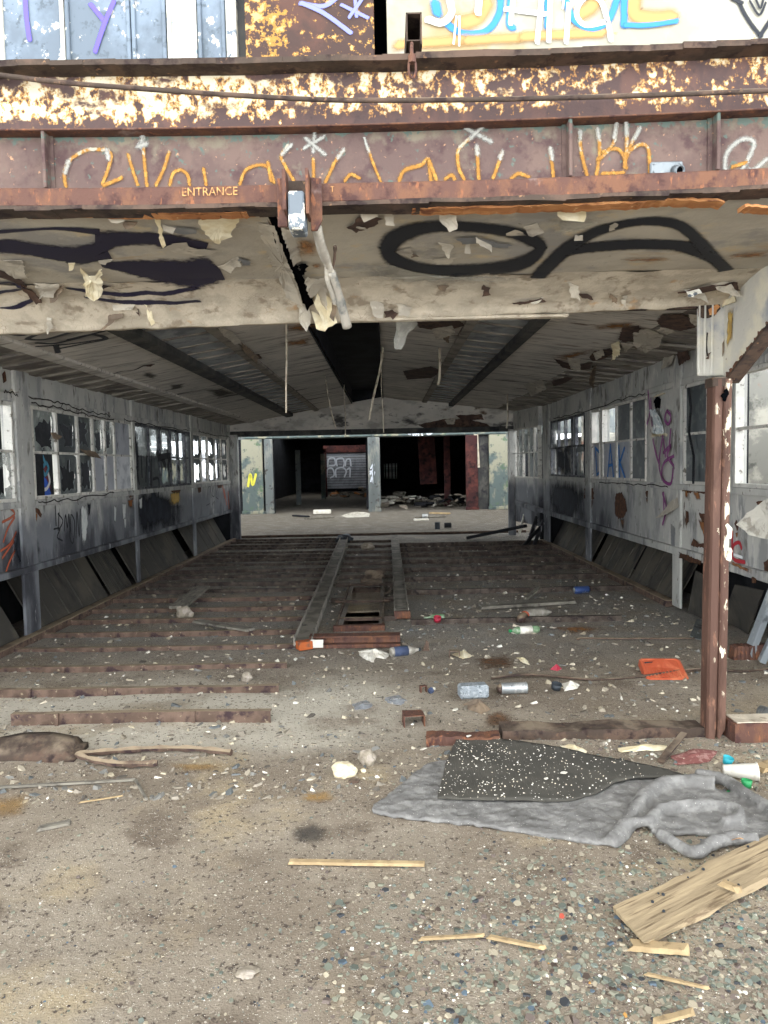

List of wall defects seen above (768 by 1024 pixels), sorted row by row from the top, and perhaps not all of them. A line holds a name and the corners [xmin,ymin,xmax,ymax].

peeling [68,259,112,301]
peeling [154,218,251,273]
crack [258,217,325,311]
rust [288,181,306,197]
peeling [347,214,395,233]
peeling [432,215,544,265]
rust [412,197,725,216]
peeling [557,211,586,222]
rust [737,203,768,215]
peeling [297,280,337,331]
peeling [678,281,742,357]
peeling [567,327,690,388]